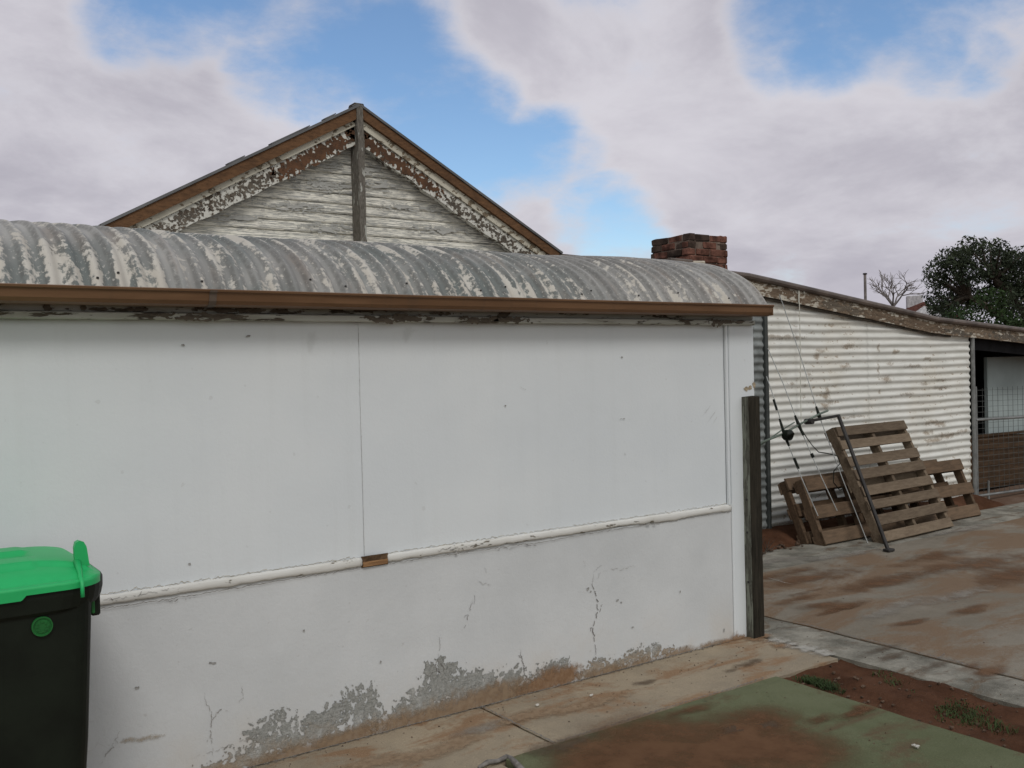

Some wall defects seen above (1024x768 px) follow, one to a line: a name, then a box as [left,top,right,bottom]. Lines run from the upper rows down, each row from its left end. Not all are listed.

peeling [143,128,528,254]
peeling [80,305,304,322]
peeling [359,312,533,324]
peeling [708,318,744,328]
peeling [767,285,946,334]
peeling [983,330,1024,342]
crack [583,561,634,647]
flaking render [192,642,688,768]